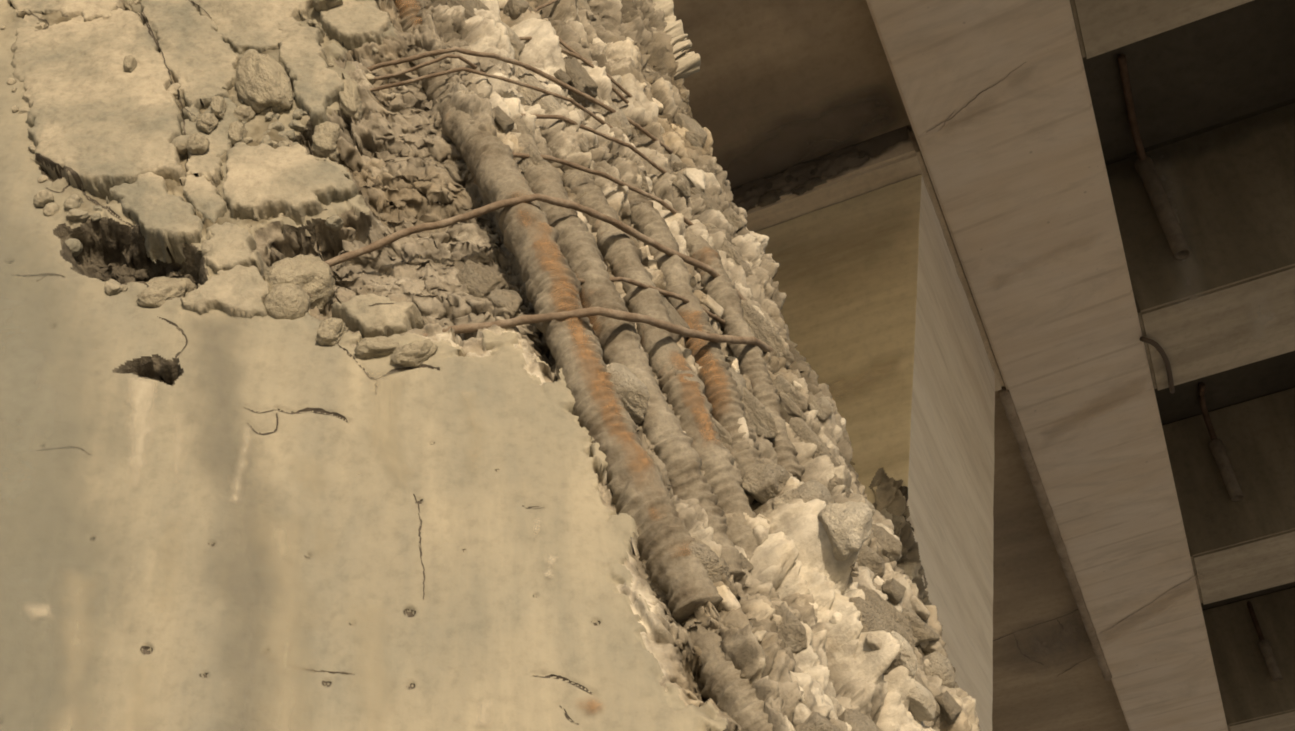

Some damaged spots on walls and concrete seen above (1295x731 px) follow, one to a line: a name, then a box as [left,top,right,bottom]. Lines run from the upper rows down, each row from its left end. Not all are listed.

crack [926,62,1026,133]
crack [244,407,348,435]
spalling [0,0,981,731]
rust [676,311,726,440]
crack [413,494,425,600]